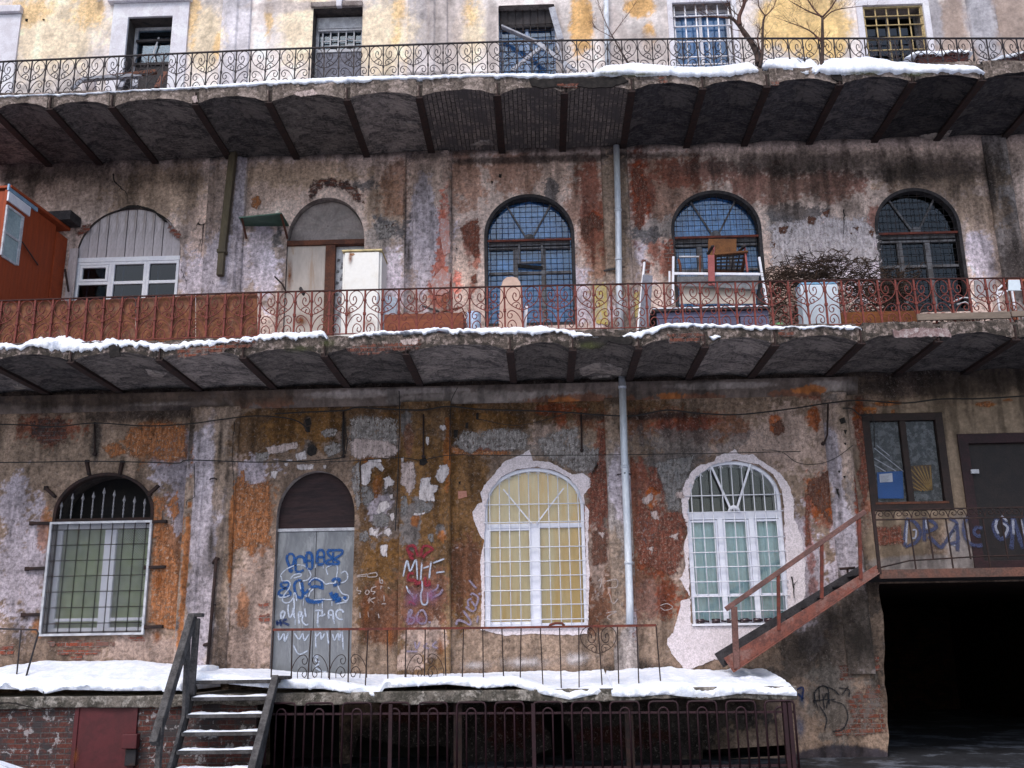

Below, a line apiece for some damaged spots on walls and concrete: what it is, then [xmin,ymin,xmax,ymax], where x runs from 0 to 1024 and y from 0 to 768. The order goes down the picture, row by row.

flaking render [308,178,365,204]
peeling [102,422,187,463]
peeling [233,413,608,636]
peeling [633,403,895,669]
flaking render [829,684,887,739]